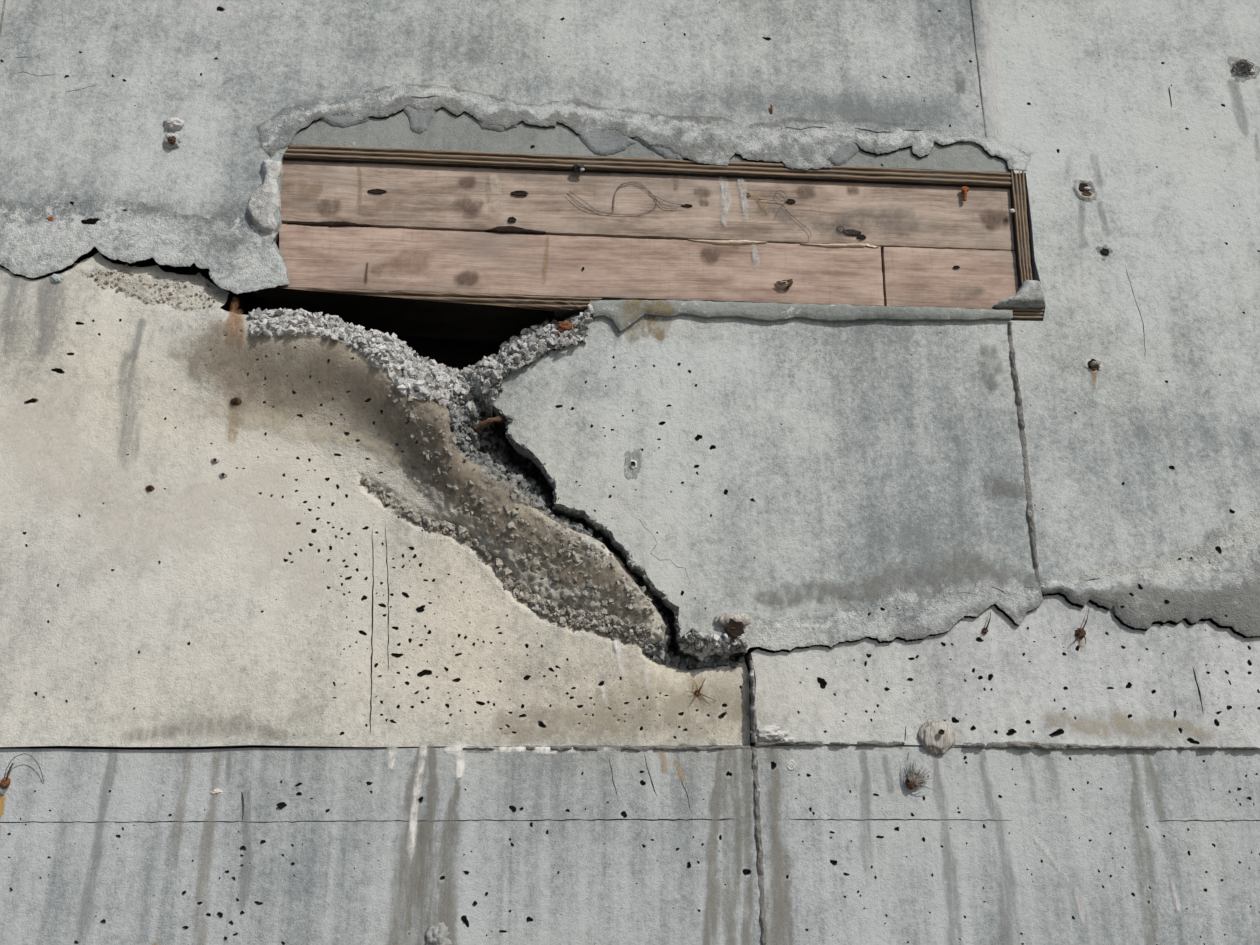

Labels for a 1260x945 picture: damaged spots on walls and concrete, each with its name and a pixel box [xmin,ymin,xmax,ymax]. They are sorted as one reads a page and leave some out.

peeling [246,83,1031,235]
spalling [73,263,229,313]
damp [190,324,636,621]
spalling [361,477,652,649]
crack [448,350,745,670]
damp [614,640,623,671]
spalling [671,628,748,662]
damp [390,663,752,945]
damp [770,746,792,945]